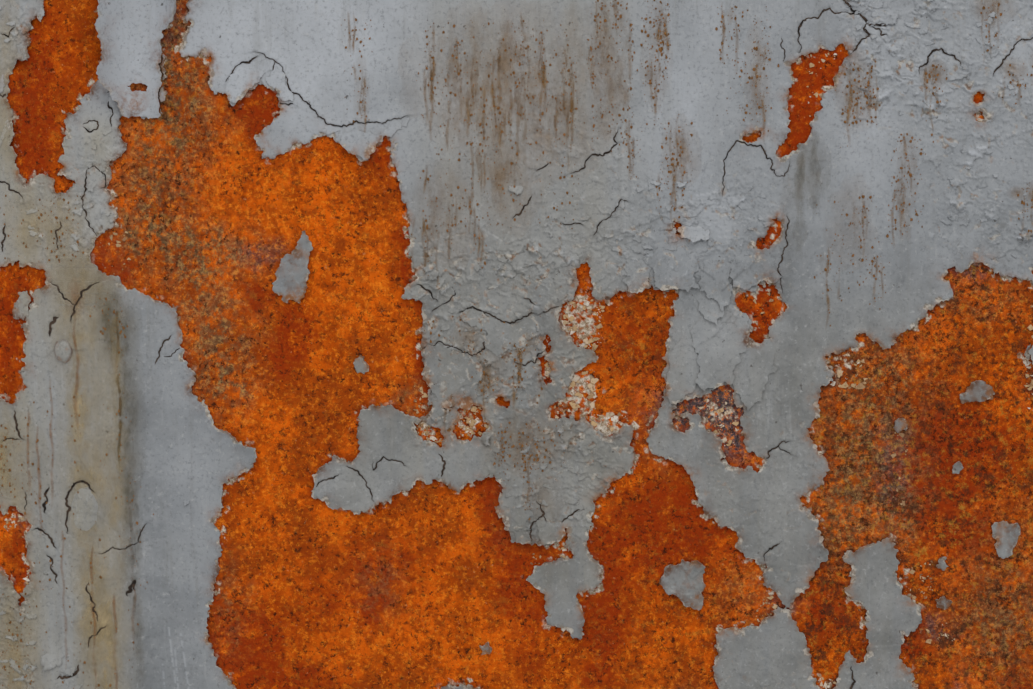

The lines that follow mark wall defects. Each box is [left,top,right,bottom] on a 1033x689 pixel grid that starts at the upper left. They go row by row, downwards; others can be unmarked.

rust [344,18,372,122]
rust [411,0,693,269]
rust [715,6,779,132]
peeling [776,43,849,158]
peeling [973,91,985,122]
peeling [90,0,787,689]
rust [493,422,565,520]
peeling [787,262,1033,689]
crack [24,480,95,583]
crack [57,582,106,679]
crack [99,524,146,554]
crack [126,580,136,596]